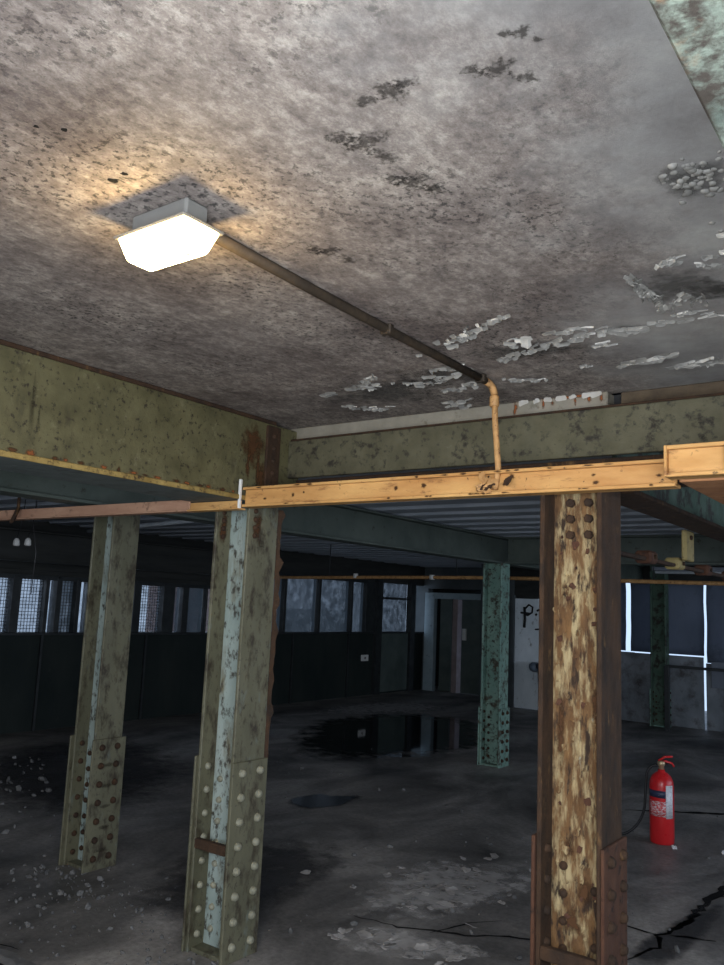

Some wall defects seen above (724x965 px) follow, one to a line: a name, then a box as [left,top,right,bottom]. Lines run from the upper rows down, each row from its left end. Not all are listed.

peeling [319,364,479,412]
peeling [432,314,511,350]
spalling [513,391,603,414]
peeling [616,352,724,370]
rust [241,426,266,499]
rust [553,566,597,665]
rust [556,684,597,753]
rust [555,759,596,946]
crack [0,944,36,965]
crack [627,886,724,961]